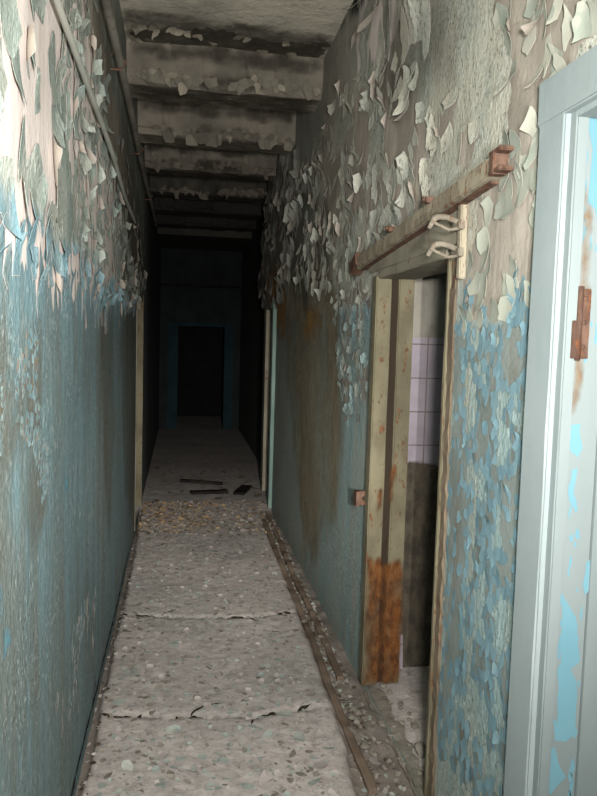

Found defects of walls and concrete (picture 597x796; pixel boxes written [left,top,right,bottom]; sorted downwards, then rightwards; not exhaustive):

peeling [0,0,148,334]
peeling [128,0,480,429]
peeling [400,0,597,796]
crack [175,703,220,719]
crack [219,611,290,622]
corrosion [366,558,402,684]